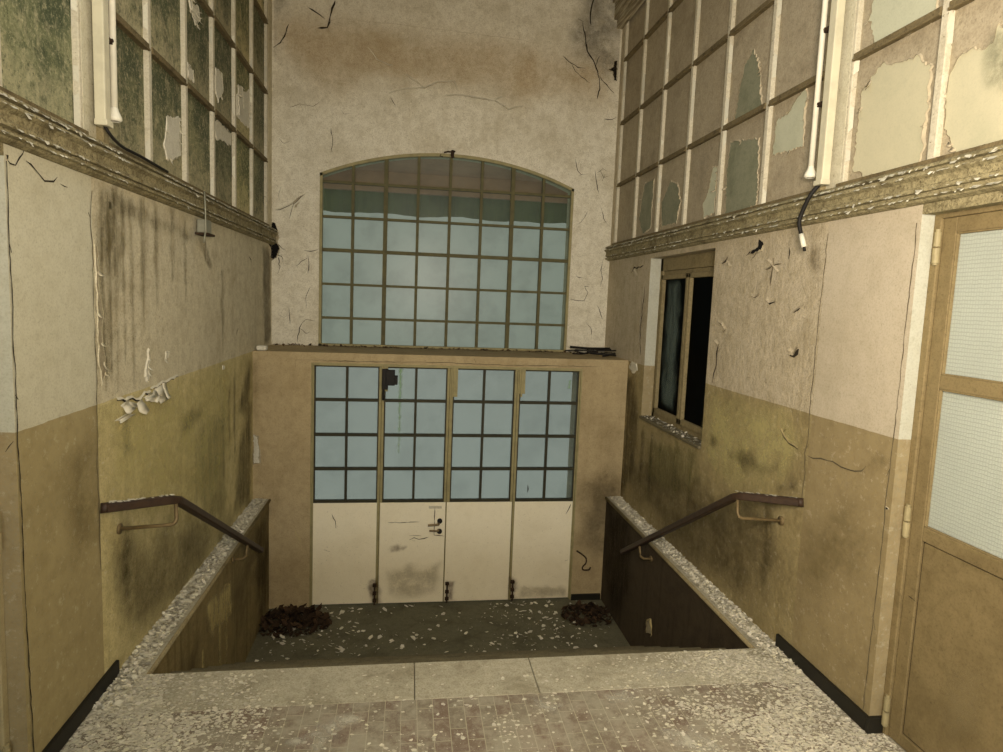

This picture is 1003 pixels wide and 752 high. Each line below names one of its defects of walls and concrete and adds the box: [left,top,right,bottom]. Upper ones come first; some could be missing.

peeling [188,0,202,30]
crack [308,1,335,29]
peeling [863,0,939,43]
peeling [163,115,186,164]
peeling [215,67,223,103]
peeling [215,120,231,145]
crack [563,0,615,120]
peeling [735,49,763,119]
peeling [703,88,809,219]
peeling [852,53,934,177]
peeling [944,23,1003,152]
peeling [115,348,178,423]